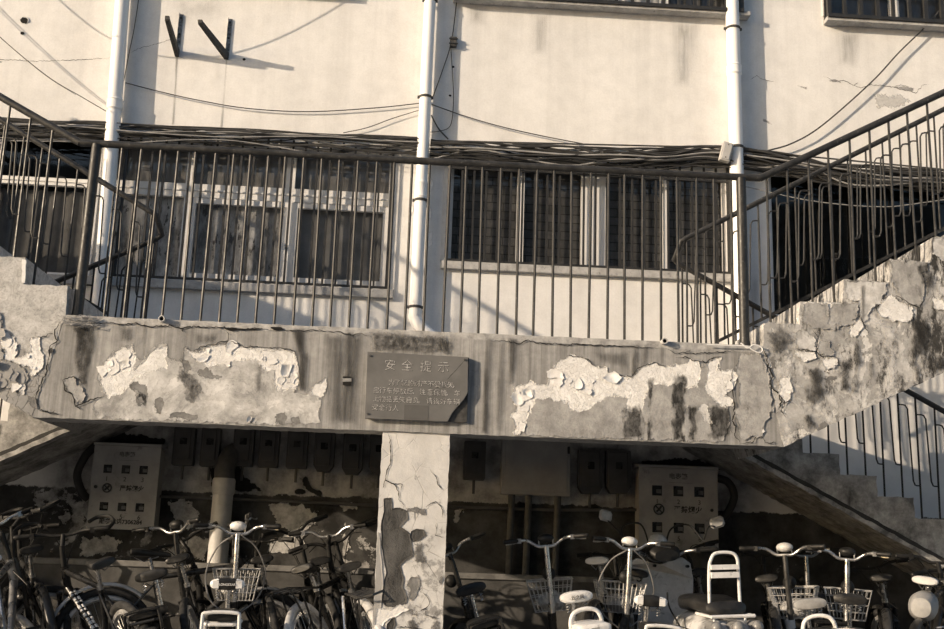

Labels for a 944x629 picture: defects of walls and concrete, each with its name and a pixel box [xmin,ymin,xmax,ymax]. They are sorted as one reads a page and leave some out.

crack [827,77,929,93]
peeling [794,239,944,369]
peeling [0,328,53,409]
peeling [64,327,327,426]
damp [624,408,651,440]
peeling [510,352,793,443]
damp [671,376,696,442]
damp [708,407,729,438]
damp [805,368,825,403]
mould [911,319,944,381]
crack [383,434,444,537]
spalling [373,498,426,629]